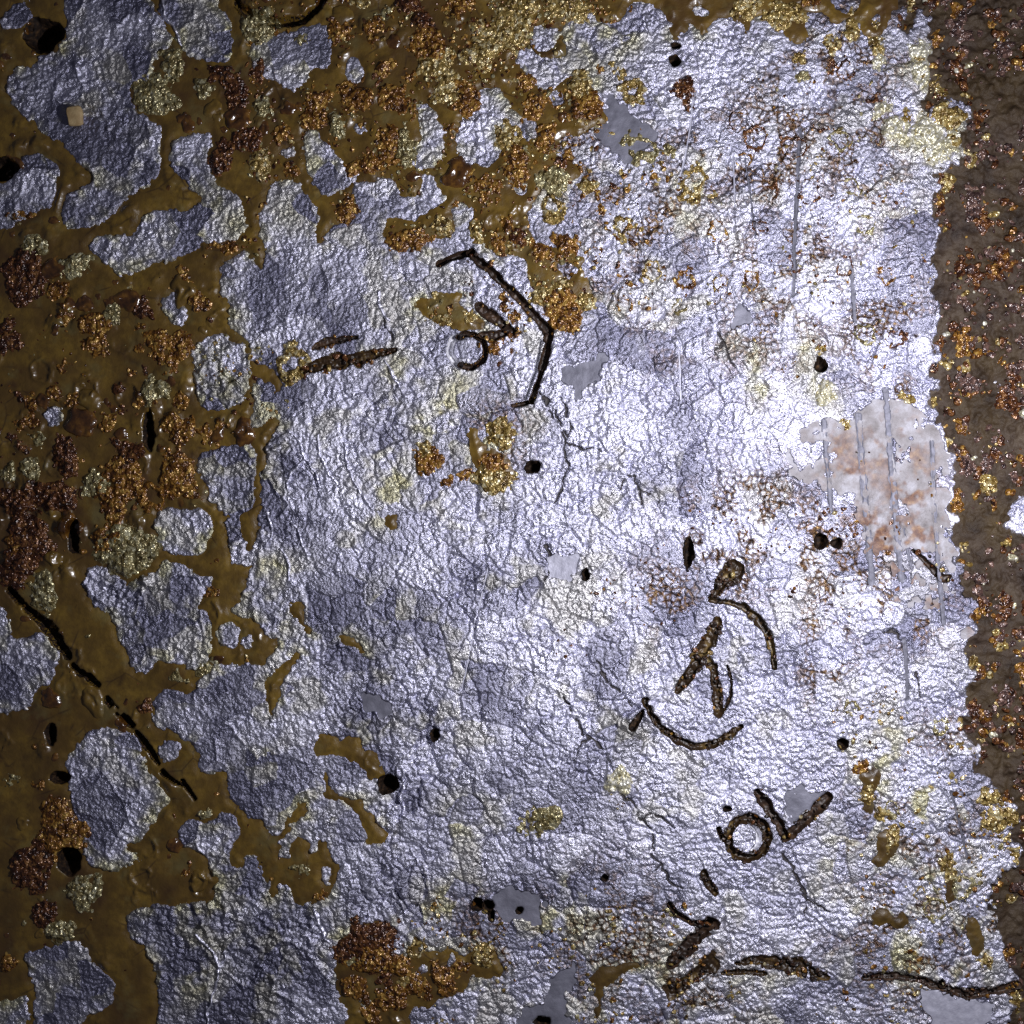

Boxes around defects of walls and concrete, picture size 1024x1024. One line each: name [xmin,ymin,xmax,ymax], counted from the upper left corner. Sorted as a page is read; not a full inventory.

hole [22,16,65,54]
rust [414,280,485,331]
peeling [562,353,609,399]
hole [524,460,541,474]
rust [688,485,791,563]
rust [832,686,909,753]
hole [377,774,399,795]
peeling [471,885,548,926]
rust [871,883,917,932]
rust [329,896,516,1024]
rust [938,917,994,971]
peeling [913,979,995,1024]